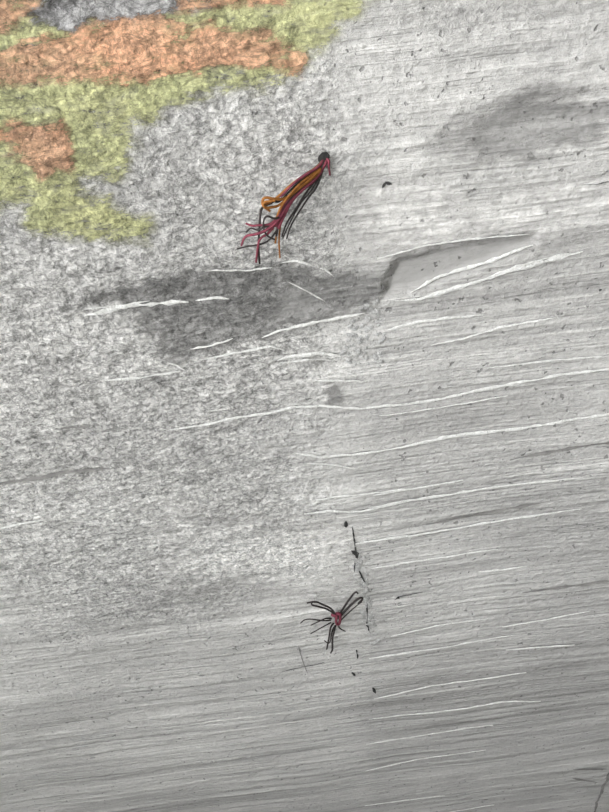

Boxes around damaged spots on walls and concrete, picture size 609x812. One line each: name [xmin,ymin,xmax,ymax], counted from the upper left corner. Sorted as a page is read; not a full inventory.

corrosion [0,0,362,242]
crack [594,773,609,812]